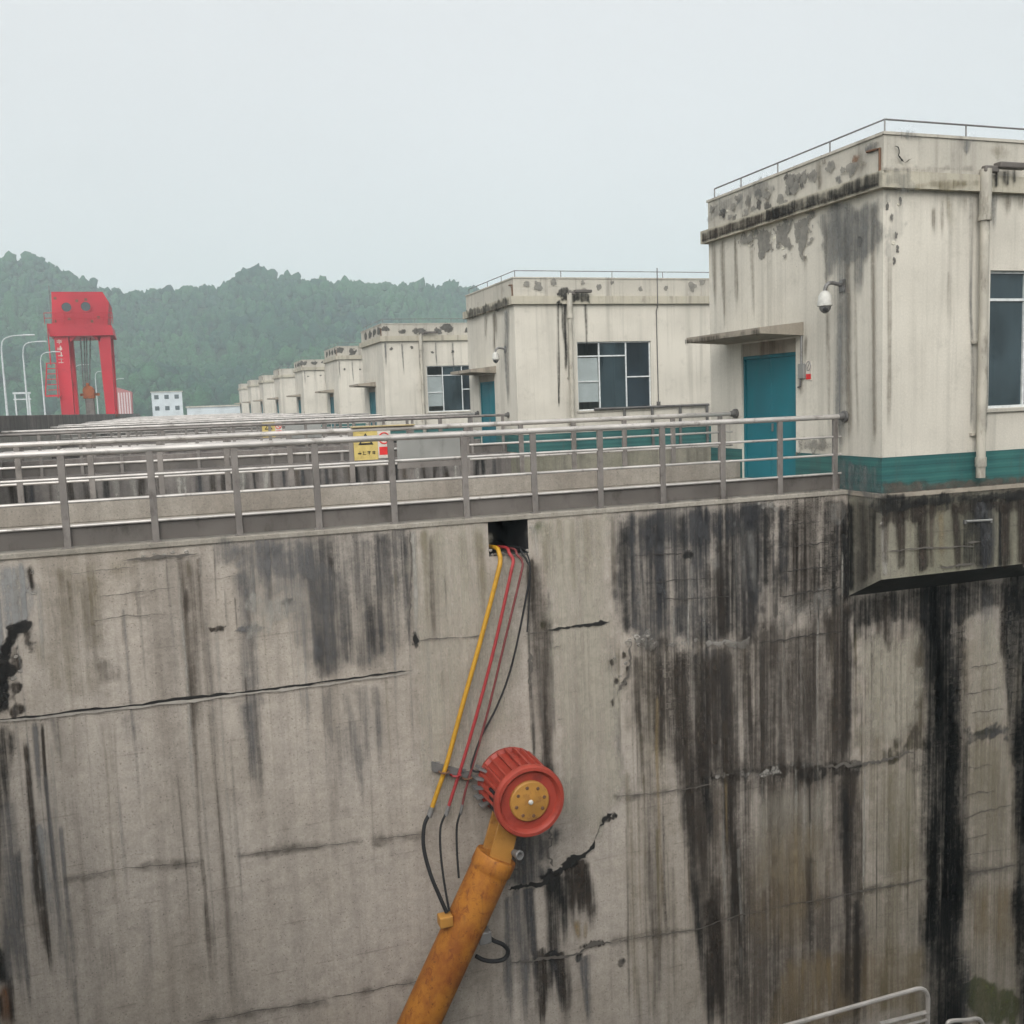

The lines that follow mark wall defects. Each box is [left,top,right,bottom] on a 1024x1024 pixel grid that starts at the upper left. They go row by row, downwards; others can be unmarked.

peeling [710,144,877,221]
peeling [523,278,556,291]
water stain [557,304,567,403]
water stain [884,476,1024,568]
peeling [26,568,38,595]
peeling [0,620,36,718]
crack [0,670,413,722]
water stain [209,518,621,834]
crack [526,620,608,684]
water stain [602,504,1024,1024]
water stain [0,723,70,987]
crack [508,784,711,893]